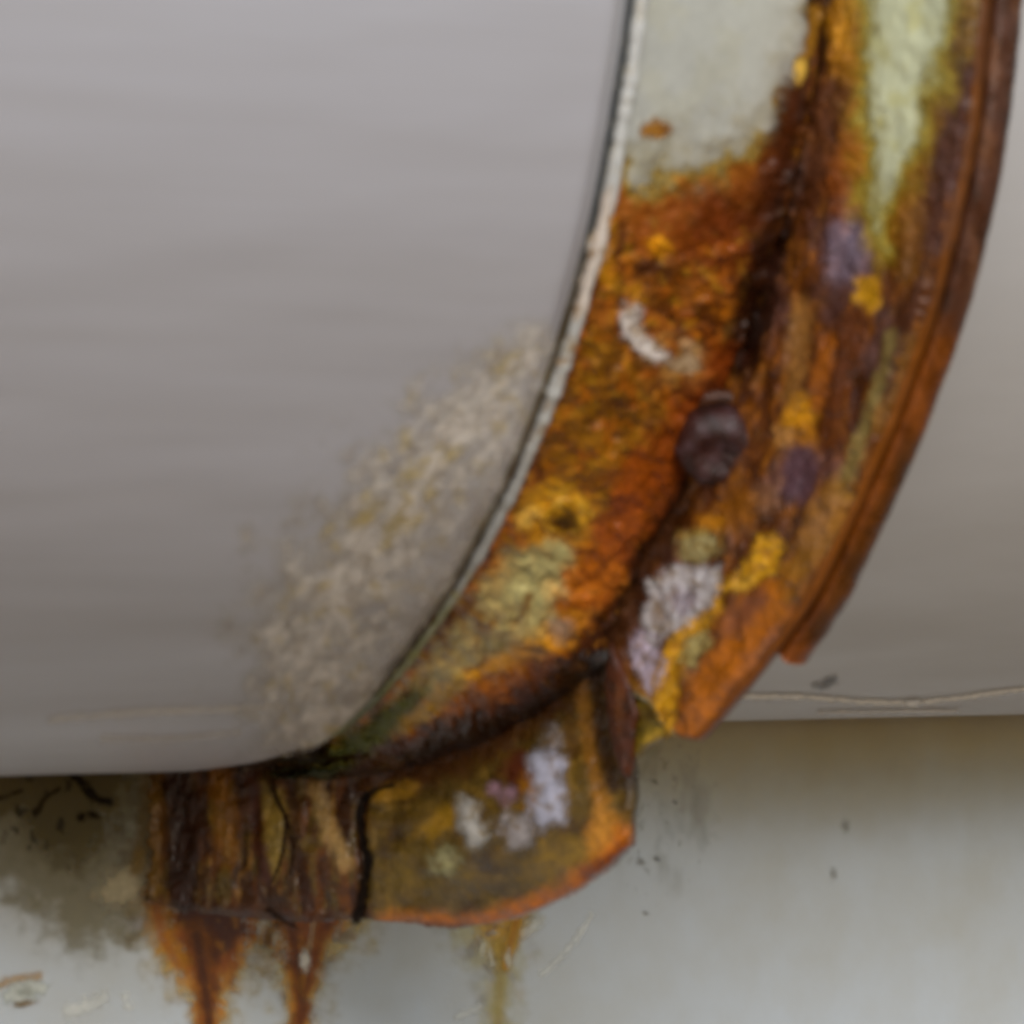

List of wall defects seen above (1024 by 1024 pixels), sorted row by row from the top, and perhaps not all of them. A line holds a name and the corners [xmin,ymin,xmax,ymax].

rust [261,0,980,792]
rust [132,882,361,1024]